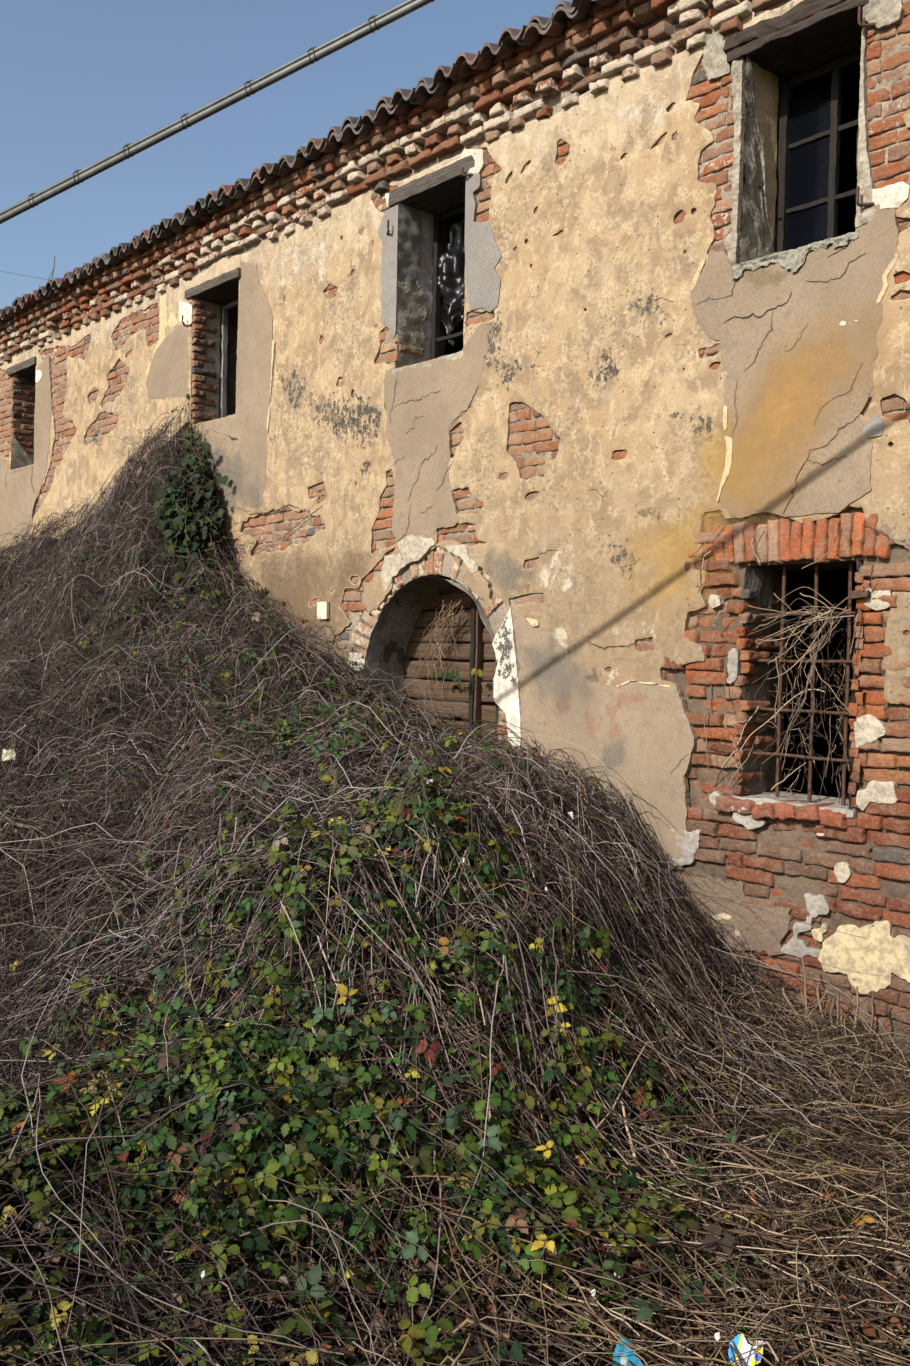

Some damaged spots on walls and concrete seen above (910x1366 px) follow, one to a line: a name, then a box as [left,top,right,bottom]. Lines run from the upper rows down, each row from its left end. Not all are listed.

spalling [669,58,747,290]
spalling [866,0,910,189]
spalling [0,368,19,458]
spalling [35,294,195,513]
spalling [230,482,327,570]
leakage [277,365,381,485]
spalling [310,469,544,676]
spalling [499,402,561,501]
crack [650,239,865,434]
crack [783,363,863,513]
spalling [862,394,910,422]
spalling [606,406,910,1063]